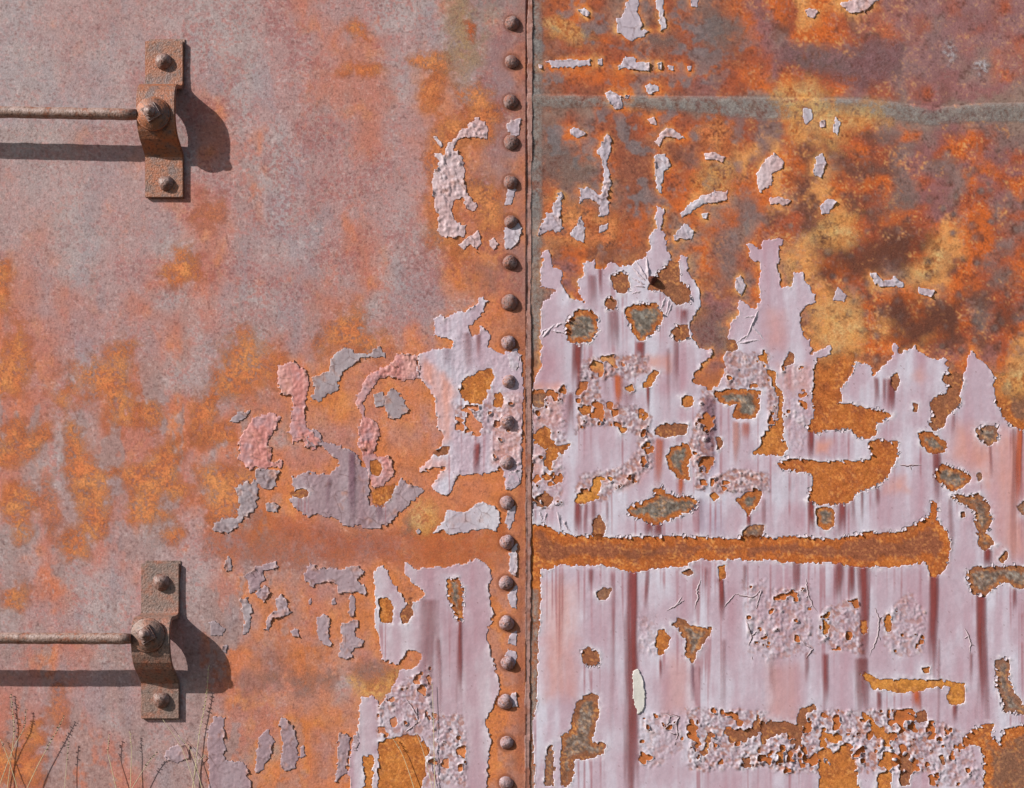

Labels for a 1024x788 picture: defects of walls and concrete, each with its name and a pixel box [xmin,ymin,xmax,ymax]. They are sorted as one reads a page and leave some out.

peeling [432,117,522,252]
peeling [704,152,726,163]
peeling [813,153,826,178]
rust [776,84,872,146]
rust [631,257,657,294]
rust [313,309,390,362]
rust [0,329,286,559]
peeling [207,189,1024,788]
rust [627,572,648,788]
rust [835,563,869,693]
rust [929,576,938,652]
rust [977,595,986,687]